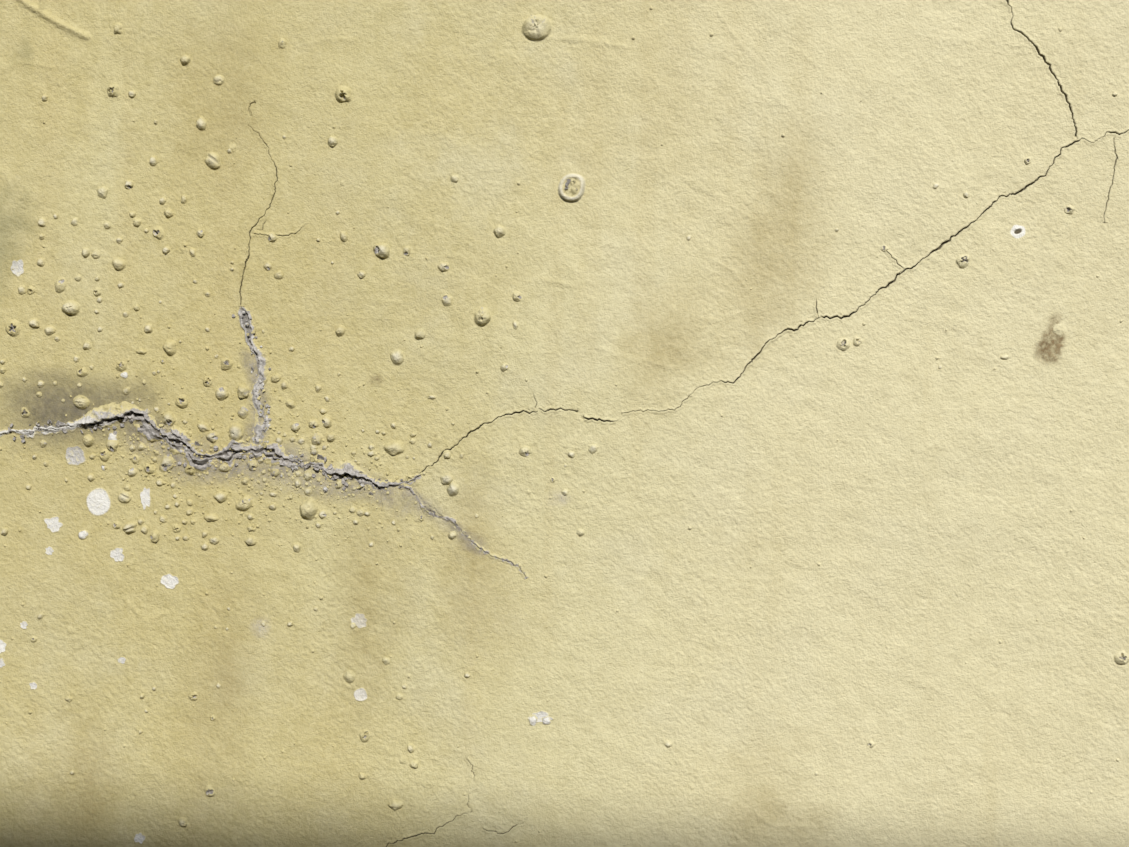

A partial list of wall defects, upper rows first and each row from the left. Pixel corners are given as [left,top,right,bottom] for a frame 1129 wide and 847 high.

peeling [64,445,87,466]
crack [0,0,1129,580]